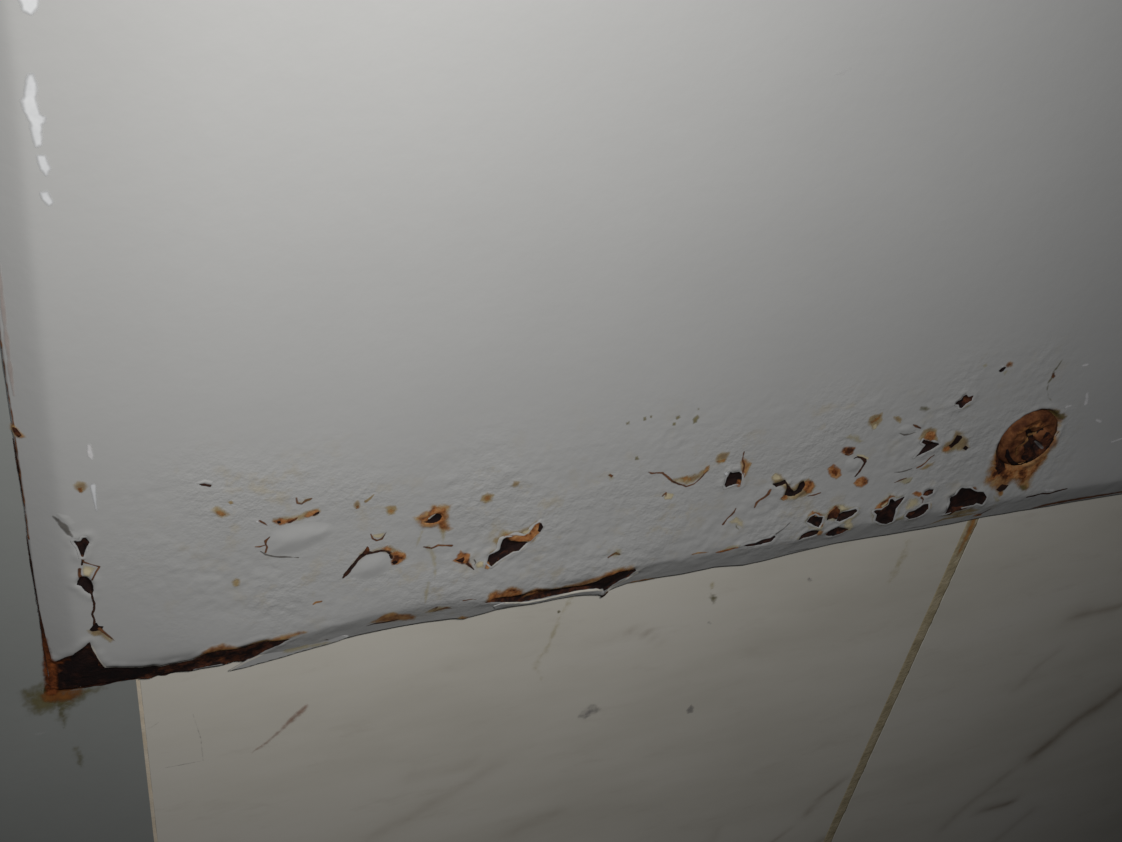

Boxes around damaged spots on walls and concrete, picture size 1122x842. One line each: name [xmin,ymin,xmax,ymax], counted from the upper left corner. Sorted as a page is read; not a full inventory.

corrosion [986,409,1064,496]
corrosion [828,464,841,479]
corrosion [416,506,450,531]
corrosion [424,544,483,569]
peeling [483,519,546,569]
corrosion [504,523,540,542]
corrosion [754,474,821,508]
peeling [806,486,989,529]